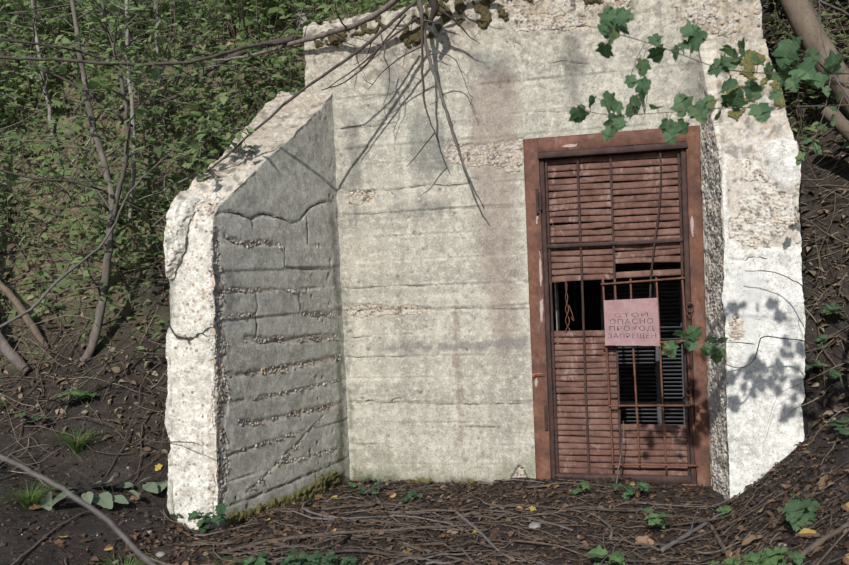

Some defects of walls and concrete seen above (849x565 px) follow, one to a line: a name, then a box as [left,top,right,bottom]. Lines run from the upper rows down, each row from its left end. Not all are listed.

spalling [442,137,524,172]
crack [170,197,331,281]
crack [169,325,215,345]